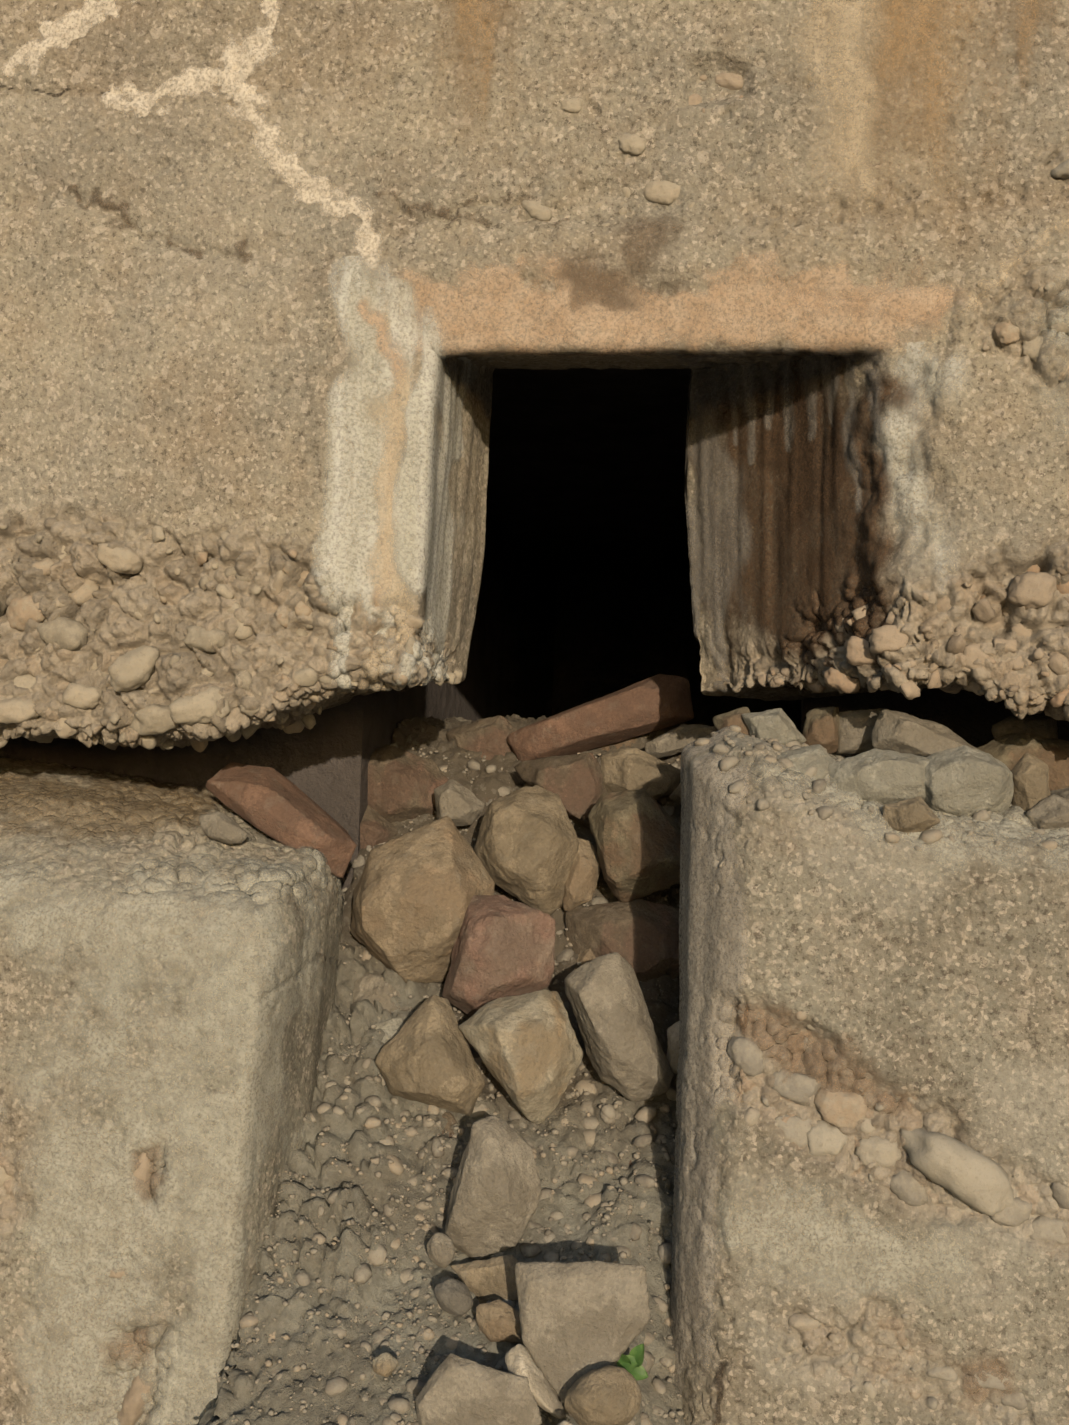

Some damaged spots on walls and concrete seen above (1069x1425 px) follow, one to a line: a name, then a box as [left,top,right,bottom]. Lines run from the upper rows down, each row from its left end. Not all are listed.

crack [0,0,509,270]
spalling [1050,159,1069,179]
spalling [976,276,1069,382]
water stain [314,256,478,692]
spalling [0,534,68,576]
spalling [0,542,463,753]
spalling [757,563,1069,721]
spalling [206,763,357,878]
spalling [707,991,1069,1245]
crack [714,1363,728,1425]